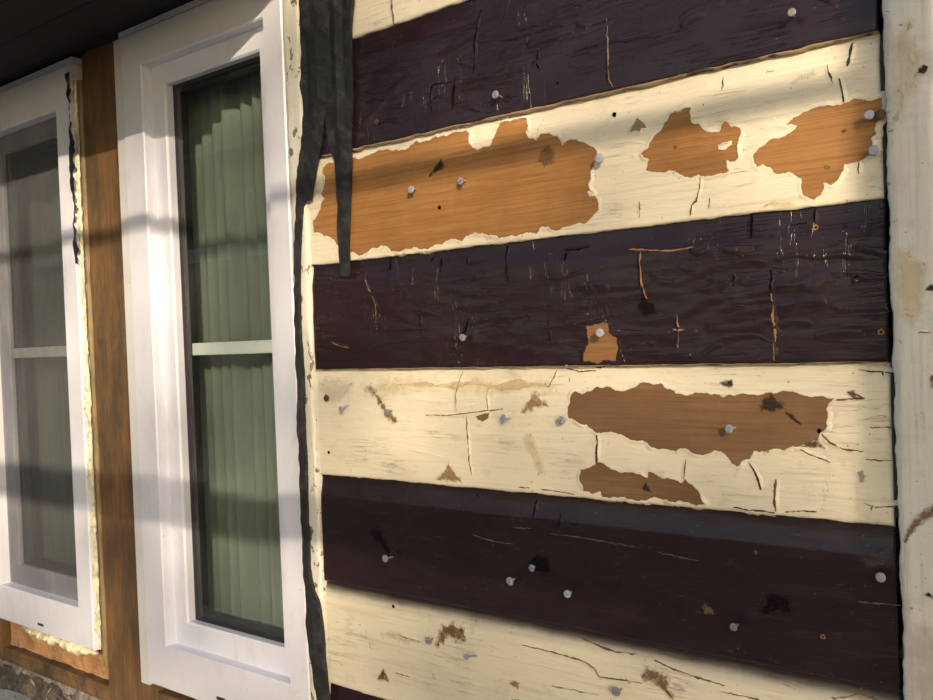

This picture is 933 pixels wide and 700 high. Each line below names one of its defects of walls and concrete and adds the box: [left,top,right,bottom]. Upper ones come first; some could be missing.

peeling [627,91,887,206]
peeling [311,160,338,250]
peeling [350,114,602,261]
crack [548,365,597,389]
peeling [580,320,622,369]
crack [426,370,504,474]
crack [594,432,602,463]
peeling [564,378,838,471]
crack [798,434,893,463]
peeling [576,458,711,510]
crack [733,462,817,517]
crack [523,635,778,700]